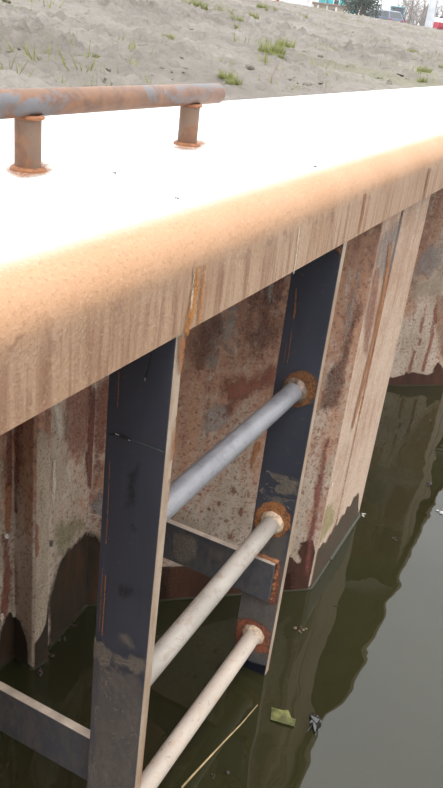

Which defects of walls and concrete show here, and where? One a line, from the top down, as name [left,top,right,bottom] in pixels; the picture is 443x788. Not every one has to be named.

corrosion [6,162,52,177]
corrosion [179,266,223,374]
corrosion [352,242,392,429]
corrosion [409,304,438,372]
corrosion [65,379,109,489]
corrosion [0,424,22,621]
corrosion [254,500,291,538]
corrosion [305,439,329,576]
corrosion [235,619,271,654]